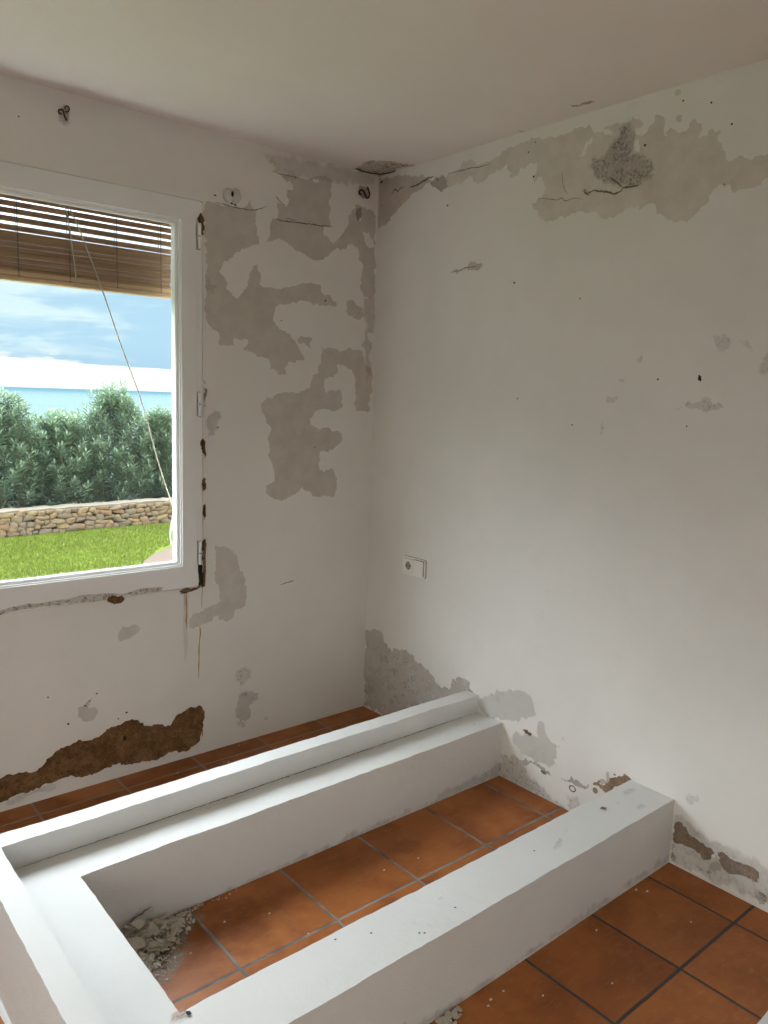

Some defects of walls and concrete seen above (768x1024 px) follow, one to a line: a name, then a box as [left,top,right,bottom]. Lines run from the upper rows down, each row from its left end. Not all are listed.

crack [543,177,640,201]
peeling [197,114,768,501]
rust [180,585,204,627]
peeling [189,539,247,629]
flaking render [0,705,205,803]
flaking render [522,758,631,793]
flaking render [673,822,759,883]